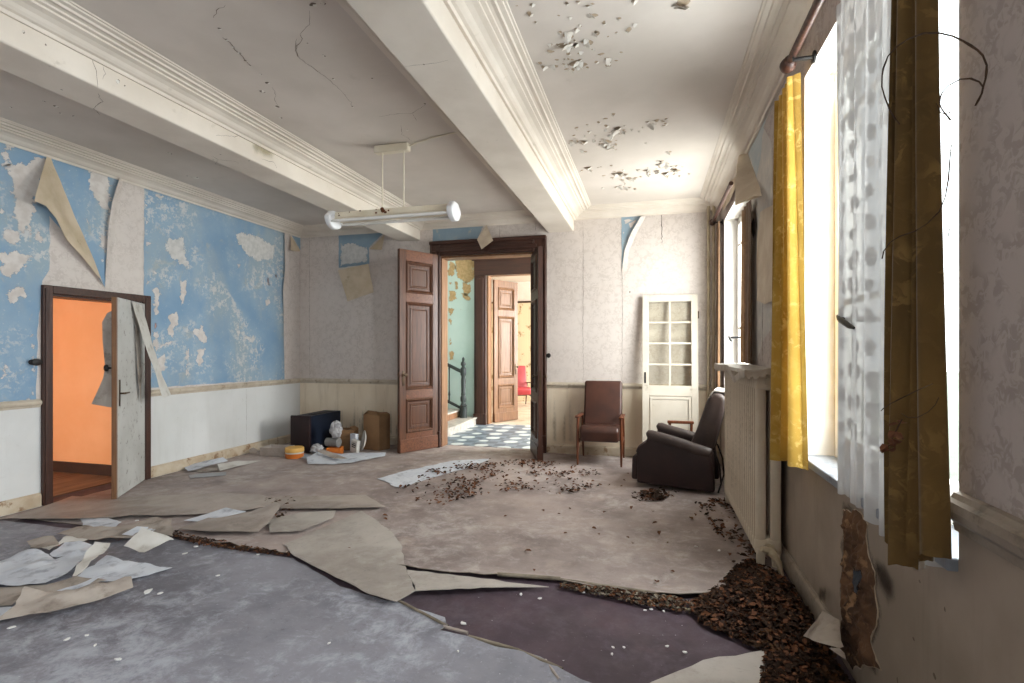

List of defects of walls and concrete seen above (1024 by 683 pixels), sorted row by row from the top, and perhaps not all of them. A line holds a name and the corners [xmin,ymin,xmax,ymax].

peeling [536,1,637,73]
peeling [672,0,690,11]
peeling [569,113,669,154]
peeling [581,151,691,191]
peeling [448,260,474,325]
spalling [840,506,882,671]